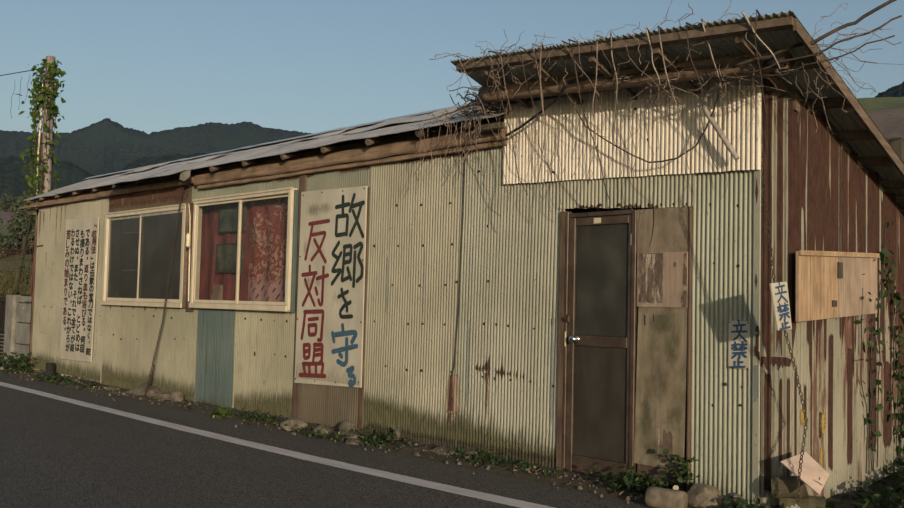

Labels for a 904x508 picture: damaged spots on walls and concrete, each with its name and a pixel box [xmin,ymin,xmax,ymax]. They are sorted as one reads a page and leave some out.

peeling [638,253,687,307]
rust [754,91,904,492]
rust [475,353,531,409]